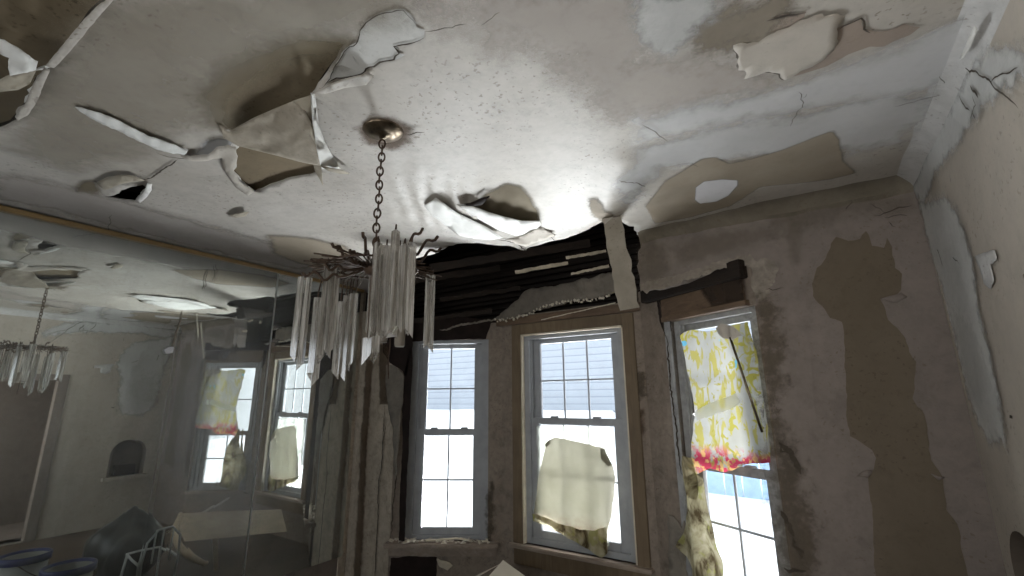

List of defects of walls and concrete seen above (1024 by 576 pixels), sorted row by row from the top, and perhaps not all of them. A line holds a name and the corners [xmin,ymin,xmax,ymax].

peeling [0,0,113,127]
flaking render [226,9,425,129]
peeling [733,11,920,80]
crack [895,68,1018,118]
spalling [108,183,152,203]
peeling [234,146,315,190]
peeling [974,250,999,289]
spalling [365,226,617,541]
peeling [812,231,968,576]